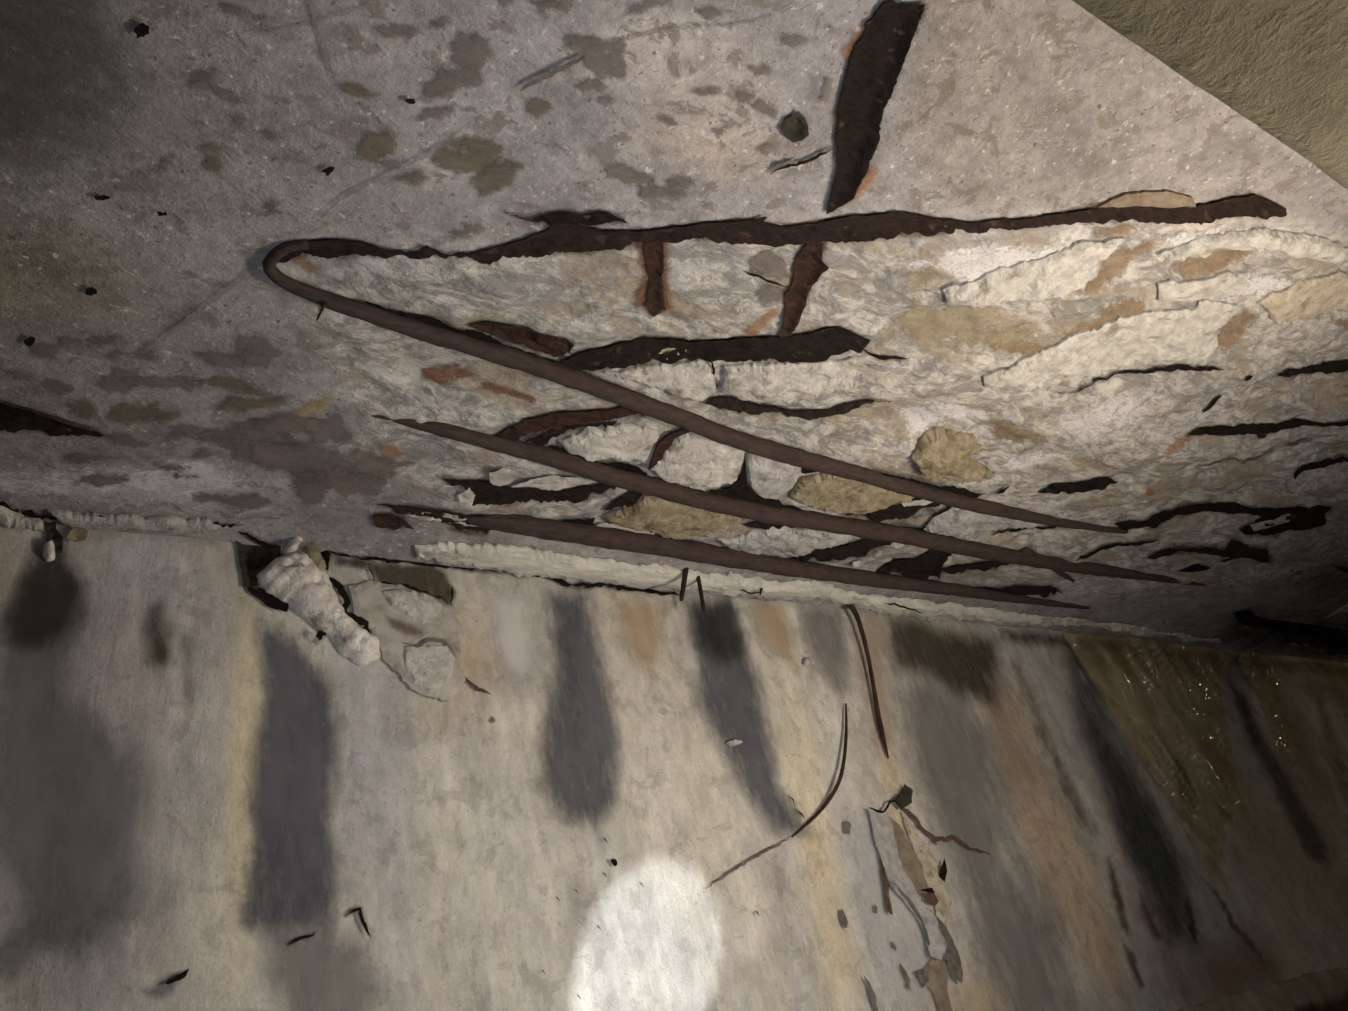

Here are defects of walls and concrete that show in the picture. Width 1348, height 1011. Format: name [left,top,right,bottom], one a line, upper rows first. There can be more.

rust [715,152,878,238]
rust [423,364,640,439]
rust [558,310,863,372]
spalling [262,236,1206,610]
peeling [983,227,1348,393]
leakage [256,537,380,666]
flaking render [340,553,491,702]
leakage [545,595,615,819]
leakage [694,605,803,831]
leakage [245,630,369,1011]
crack [705,794,805,889]
crack [903,808,996,861]